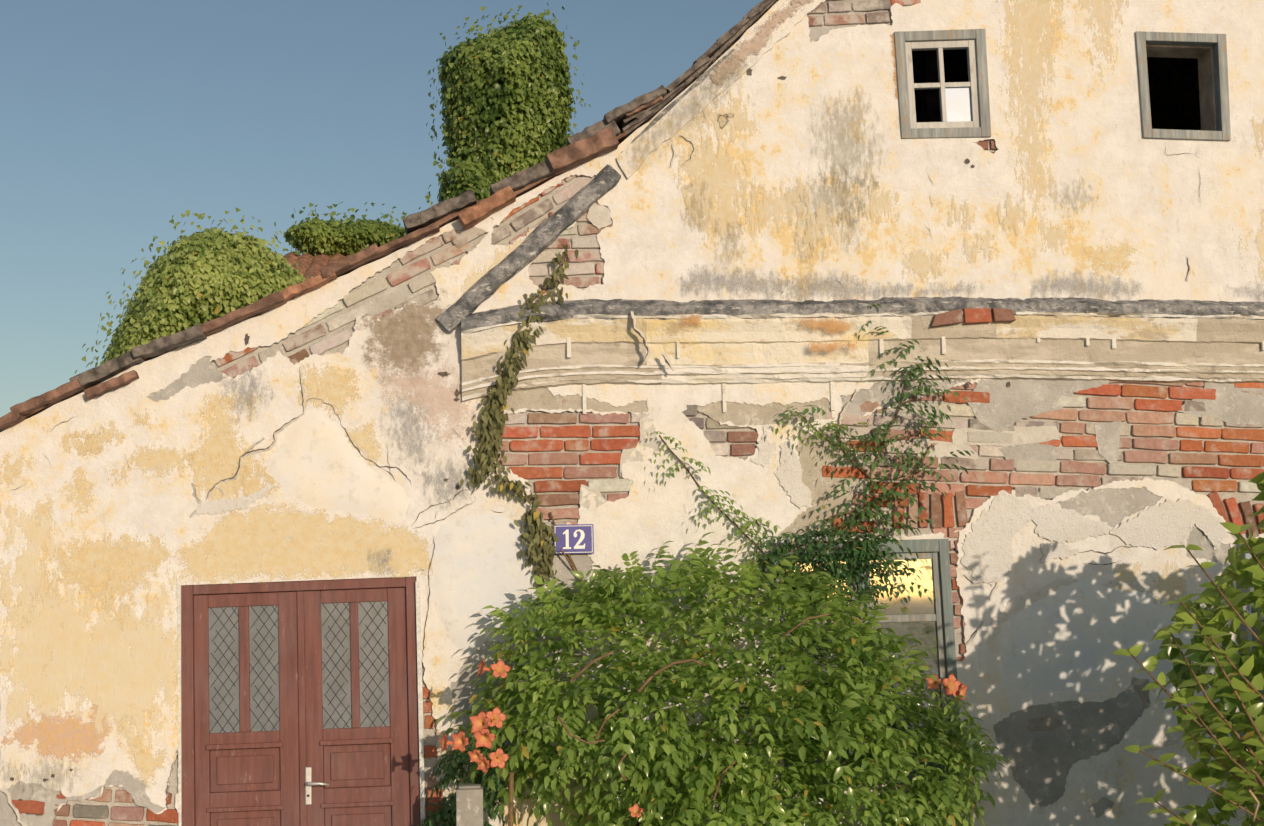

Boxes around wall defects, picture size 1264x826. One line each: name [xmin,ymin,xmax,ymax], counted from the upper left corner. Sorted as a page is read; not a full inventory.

spalling [807,0,921,42]
spalling [528,201,613,295]
peeling [1238,211,1264,282]
leakage [359,299,474,438]
peeling [0,175,595,826]
crack [189,367,509,661]
spalling [493,388,659,596]
peeling [682,379,1264,661]
peeling [507,767,674,826]
peeling [993,677,1150,807]
peeling [1088,797,1114,818]